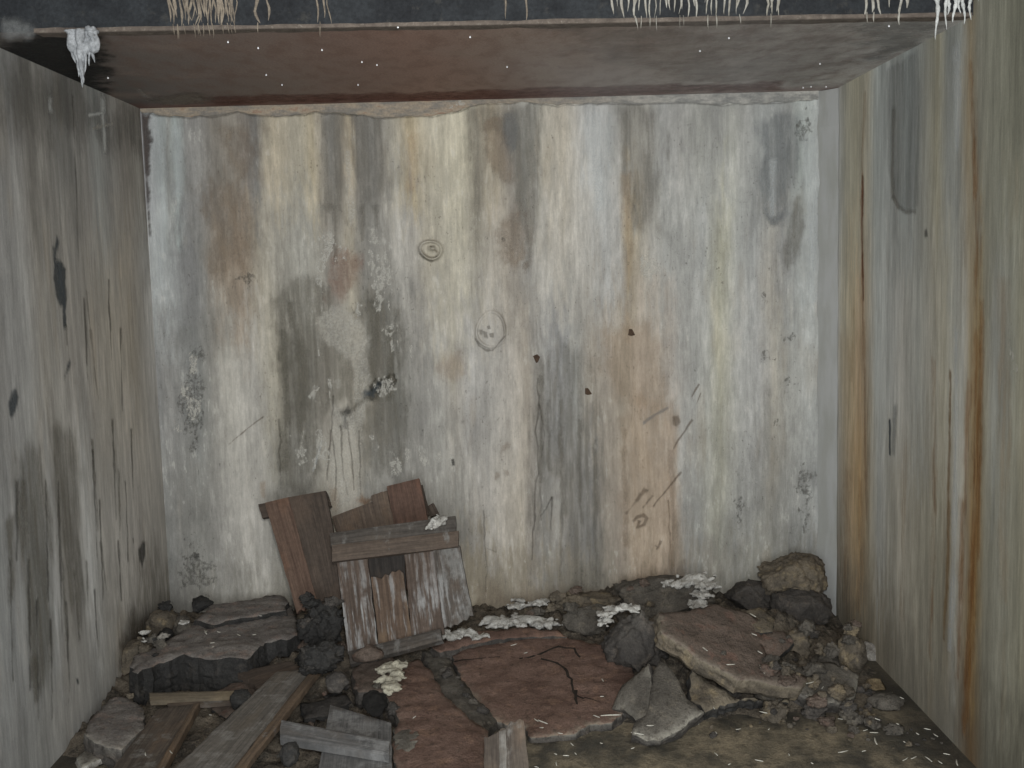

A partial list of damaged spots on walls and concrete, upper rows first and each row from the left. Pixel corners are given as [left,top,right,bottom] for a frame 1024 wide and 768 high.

damp [1,20,112,151]
damp [9,391,18,416]
crack [454,645,599,704]